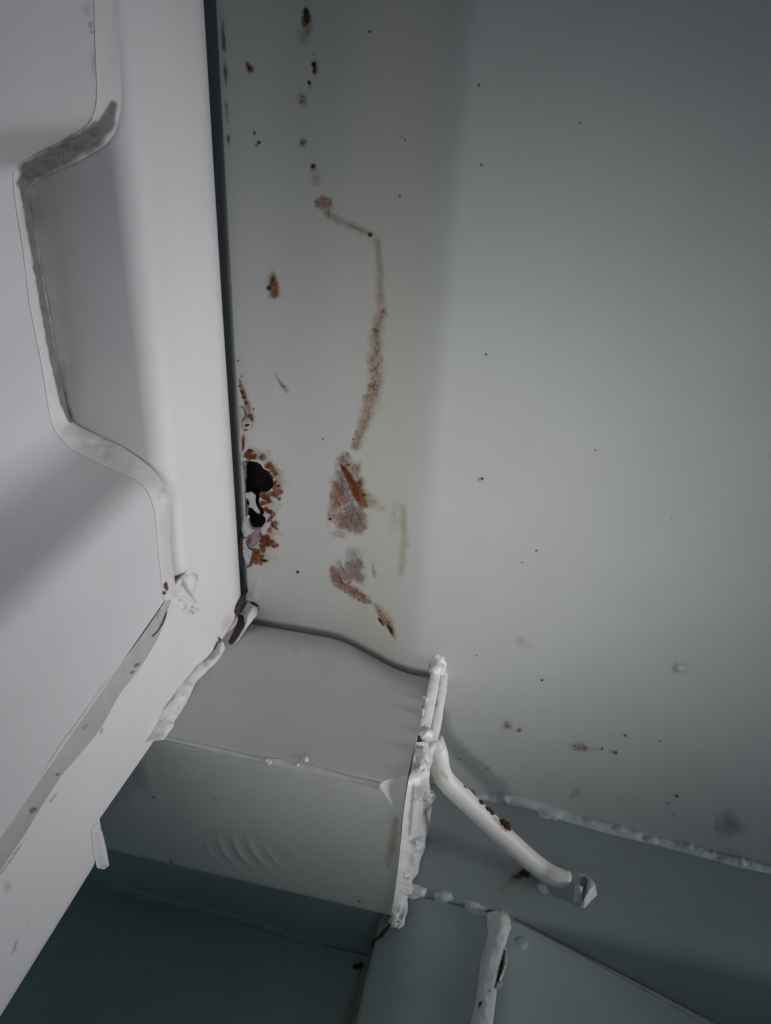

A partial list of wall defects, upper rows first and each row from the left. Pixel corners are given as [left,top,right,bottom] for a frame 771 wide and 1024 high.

rust [302,7,310,35]
rust [267,278,278,298]
spalling [241,461,274,568]
rust [238,376,283,565]
rust [328,436,367,532]
rust [330,554,393,635]
rust [479,800,511,831]